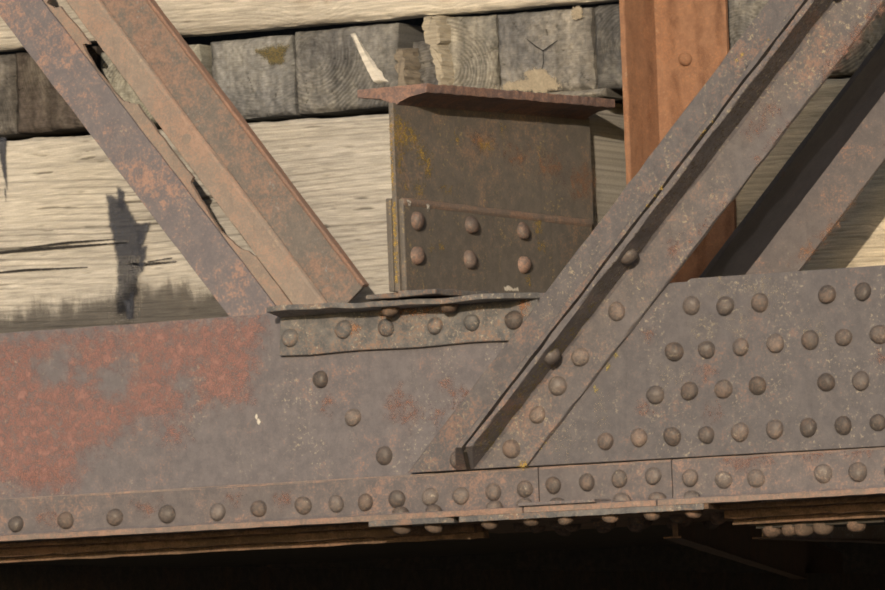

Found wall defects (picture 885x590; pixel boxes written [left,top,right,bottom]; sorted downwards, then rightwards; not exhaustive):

corrosion [44,0,292,306]